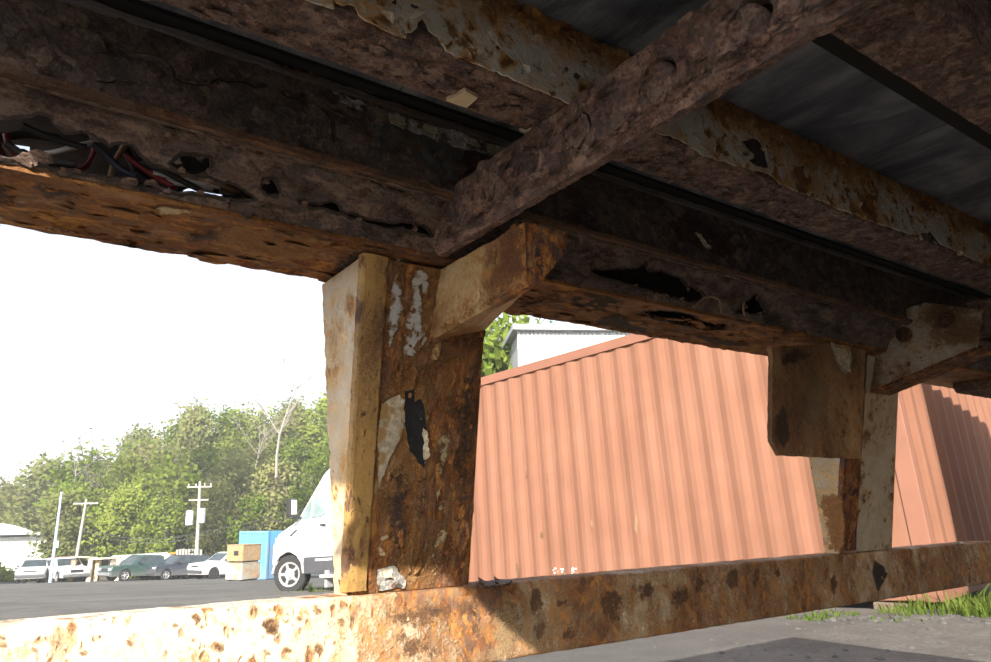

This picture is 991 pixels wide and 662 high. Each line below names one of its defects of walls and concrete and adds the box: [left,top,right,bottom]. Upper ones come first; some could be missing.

corrosion [326,251,364,276]
peeling [387,282,404,364]
corrosion [426,223,525,530]
peeling [377,395,405,485]
corrosion [388,471,427,554]
corrosion [262,617,278,635]
corrosion [388,563,520,658]
corrosion [530,588,546,645]
corrosion [601,591,622,624]
corrosion [639,582,654,598]
corrosion [670,574,707,607]
corrosion [873,560,887,591]